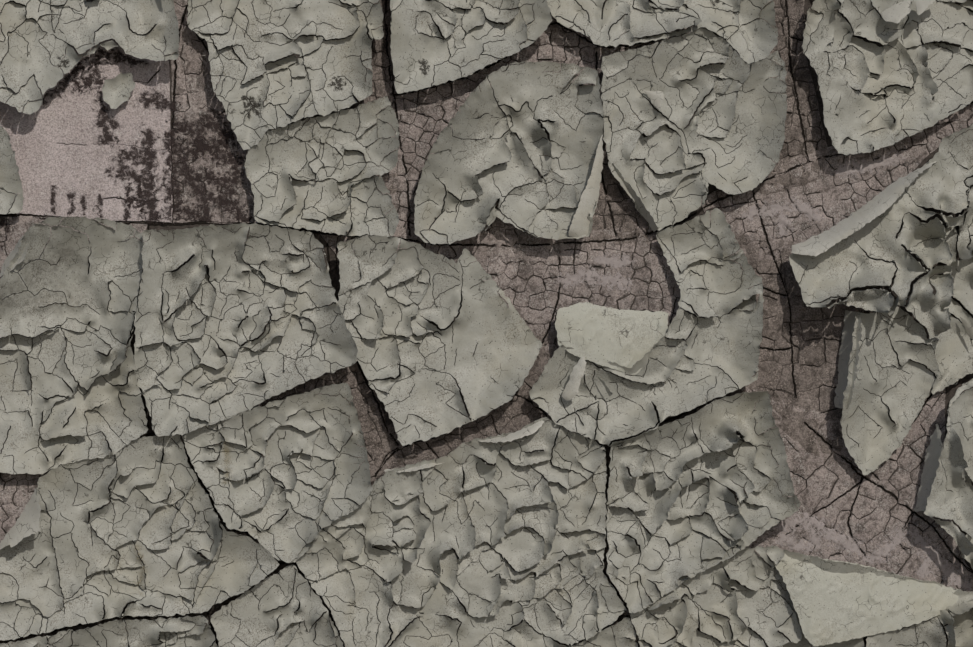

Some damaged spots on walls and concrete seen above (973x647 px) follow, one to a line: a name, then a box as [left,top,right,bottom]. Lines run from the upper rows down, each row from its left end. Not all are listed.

crack [0,211,65,219]
crack [97,3,374,315]
crack [385,0,874,398]
crack [129,270,143,347]
crack [111,370,250,535]
crack [356,361,738,493]
peeling [570,68,973,647]
crack [727,422,973,573]
crack [2,527,344,647]
crack [563,561,660,645]